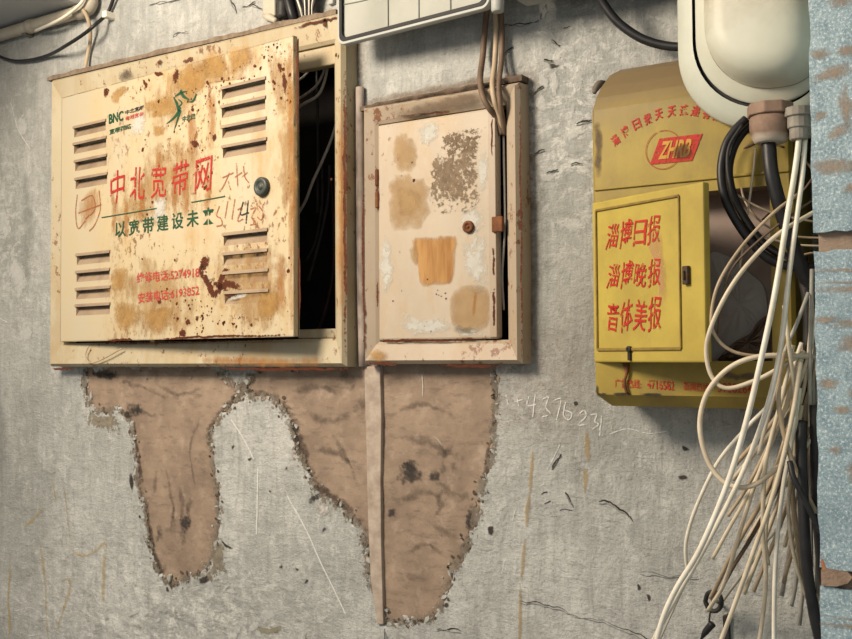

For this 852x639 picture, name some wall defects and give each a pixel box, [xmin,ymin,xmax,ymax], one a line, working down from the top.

crack [229,0,263,14]
spalling [81,366,373,594]
spalling [382,364,517,628]
crack [519,601,647,639]